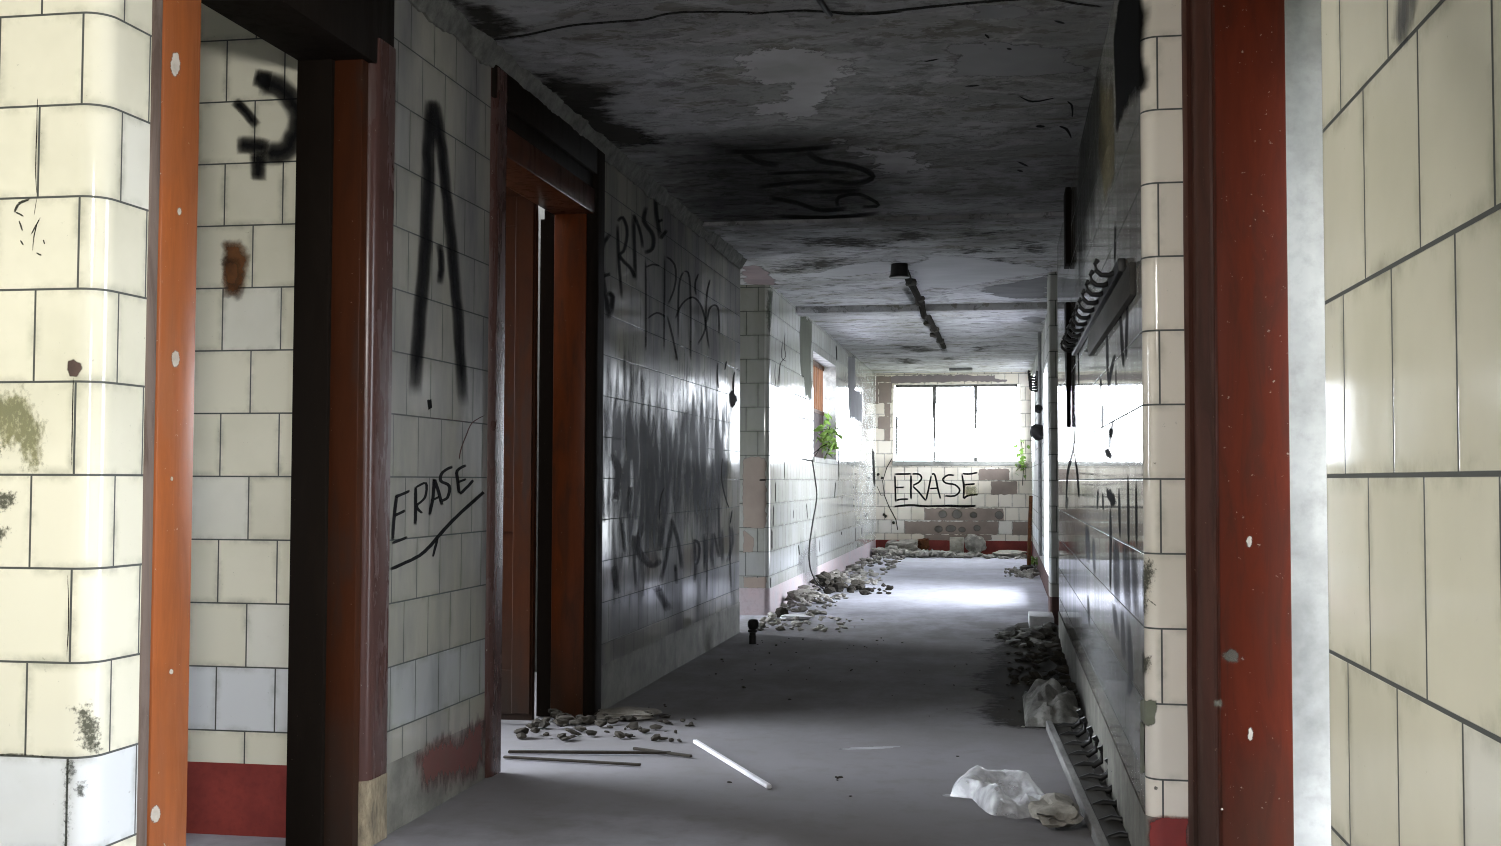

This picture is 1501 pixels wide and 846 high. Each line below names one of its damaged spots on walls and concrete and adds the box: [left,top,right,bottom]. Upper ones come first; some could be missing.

crack [494,0,1019,40]
crack [1055,0,1102,8]
peeling [734,47,856,121]
peeling [416,720,484,790]